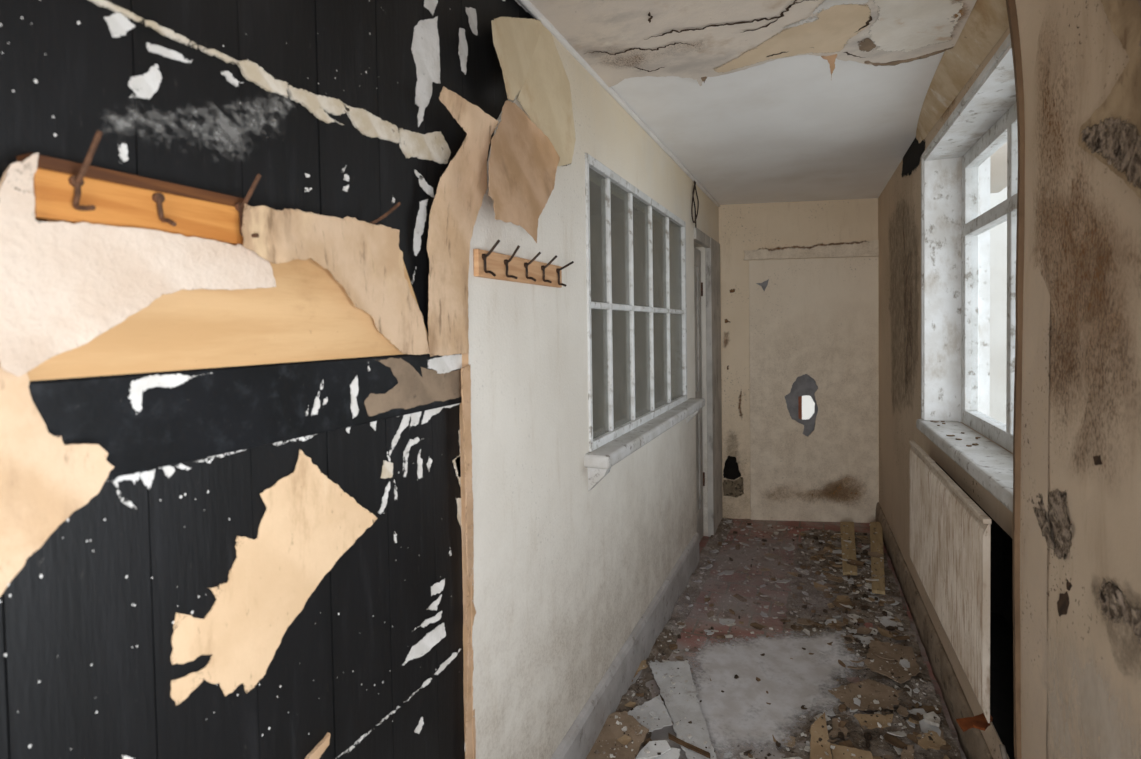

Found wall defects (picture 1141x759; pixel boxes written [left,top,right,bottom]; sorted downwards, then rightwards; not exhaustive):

peeling [458,7,478,75]
crack [589,0,818,72]
peeling [502,0,977,87]
peeling [89,0,451,256]
flaking render [1078,0,1141,199]
water stain [1037,55,1128,464]
peeling [128,372,213,414]
peeling [306,380,328,416]
peeling [346,354,462,515]
peeling [107,450,245,509]
peeling [402,578,446,666]
peeling [305,649,462,759]